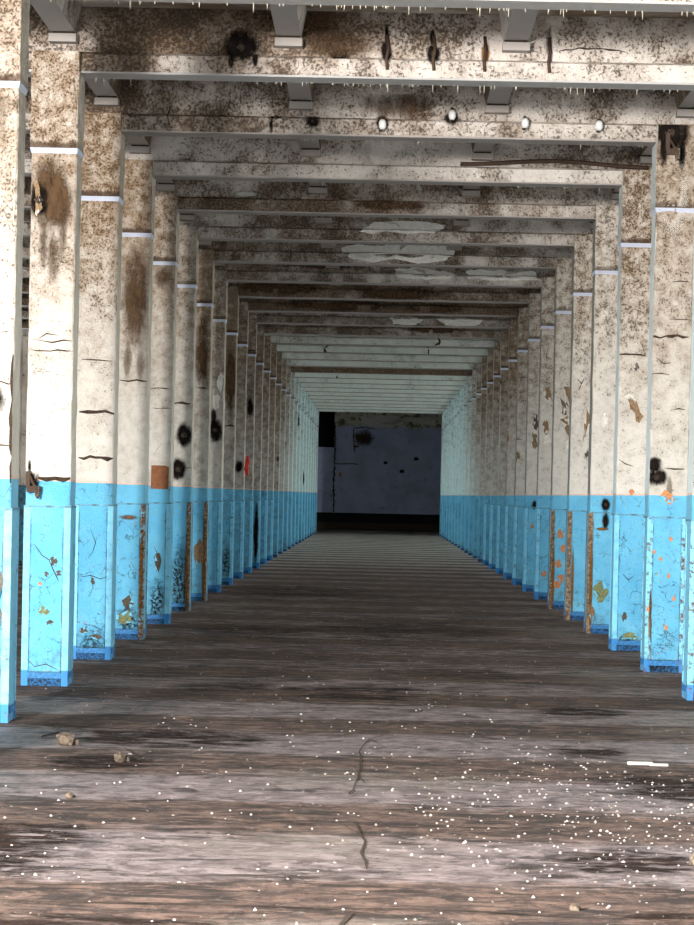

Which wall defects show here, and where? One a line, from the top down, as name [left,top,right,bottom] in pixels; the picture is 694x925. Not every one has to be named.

water stain [37,163,72,273]
peeling [360,221,445,234]
peeling [341,244,540,281]
crack [619,319,688,375]
crack [0,333,114,483]
crack [120,379,208,409]
peeling [625,393,643,423]
peeling [589,580,609,622]